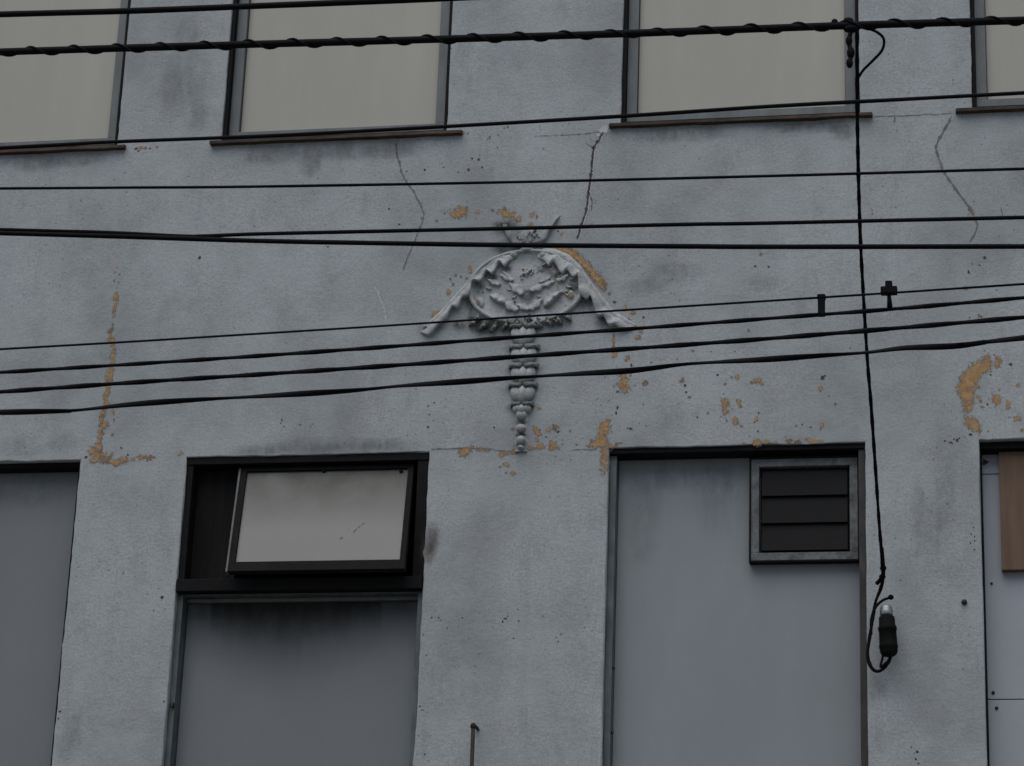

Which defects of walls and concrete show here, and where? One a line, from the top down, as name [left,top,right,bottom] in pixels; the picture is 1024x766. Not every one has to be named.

crack [395,143,425,269]
peeling [435,201,538,226]
crack [542,132,605,239]
crack [874,113,978,242]
peeling [551,230,645,339]
peeling [85,266,155,467]
peeling [455,406,622,477]
peeling [696,374,824,447]
peeling [944,350,1024,444]